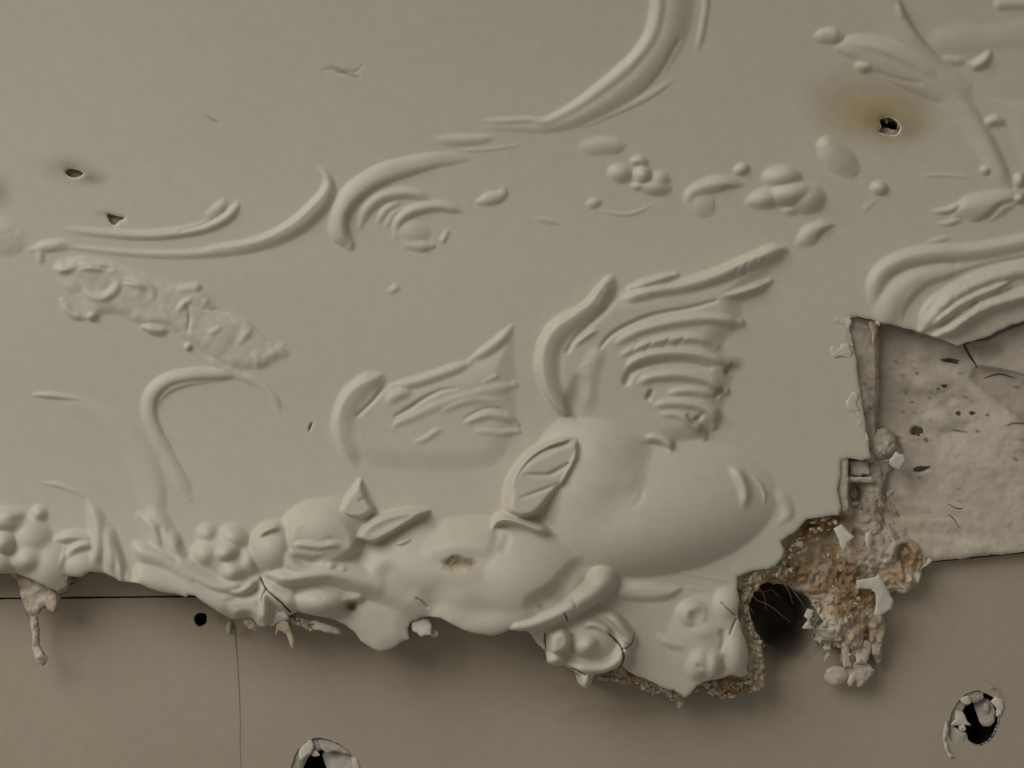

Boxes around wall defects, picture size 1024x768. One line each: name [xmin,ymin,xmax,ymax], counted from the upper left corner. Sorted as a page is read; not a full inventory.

spalling [66,169,83,177]
spalling [107,214,124,225]
flaking render [749,315,1024,688]
flaking render [445,557,472,567]
flaking render [46,594,58,612]
crack [260,578,292,613]
spalling [194,613,207,626]
crack [609,634,634,670]
spalling [955,693,998,744]
spalling [304,750,327,768]